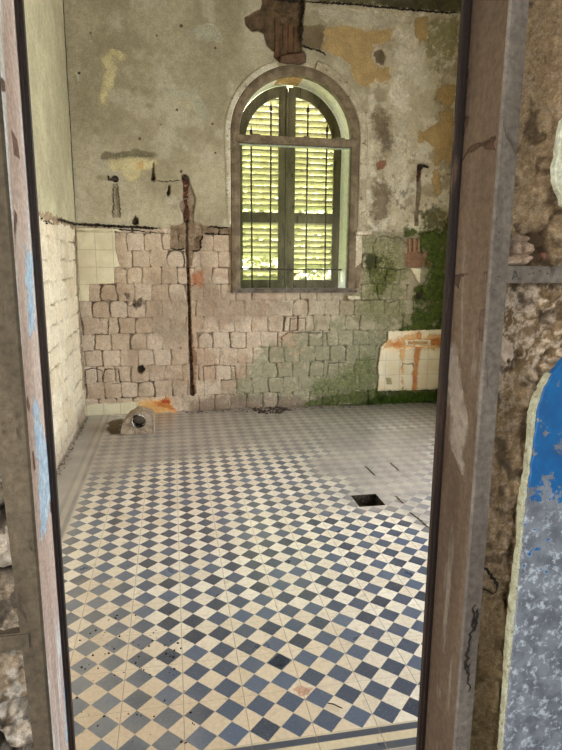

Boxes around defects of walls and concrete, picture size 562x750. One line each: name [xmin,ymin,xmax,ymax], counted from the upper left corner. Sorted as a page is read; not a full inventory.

spalling [244,0,306,65]
peeling [322,26,392,88]
peeling [109,156,157,181]
peeling [418,85,456,194]
rust [387,333,441,389]
rust [139,398,175,413]
peeling [497,357,562,750]
crack [464,567,499,692]